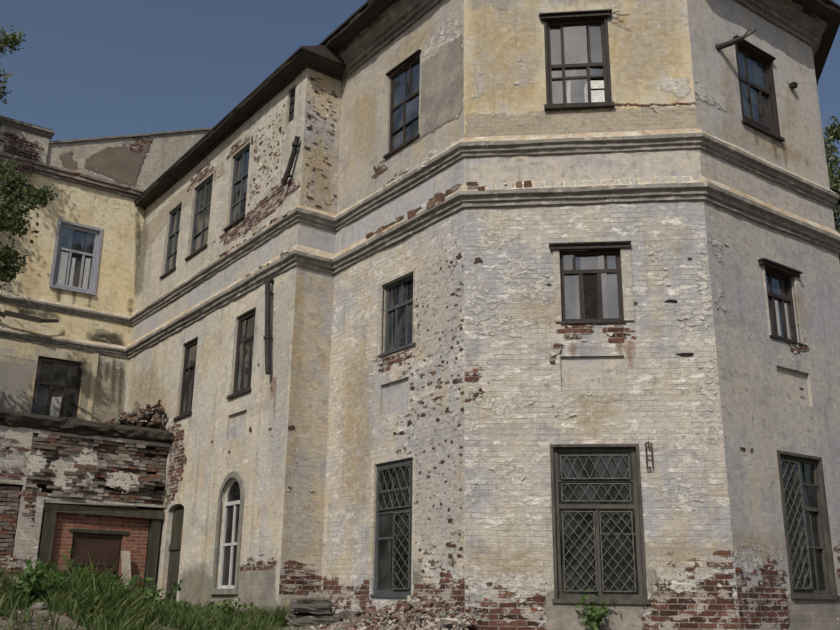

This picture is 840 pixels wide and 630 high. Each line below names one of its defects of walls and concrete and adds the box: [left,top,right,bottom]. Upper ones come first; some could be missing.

spalling [111,136,152,153]
spalling [141,77,340,253]
spalling [545,324,637,364]
spalling [0,438,38,526]
spalling [165,420,187,509]
peeling [374,242,551,630]
flaking render [239,554,376,614]
flaking render [638,542,790,630]